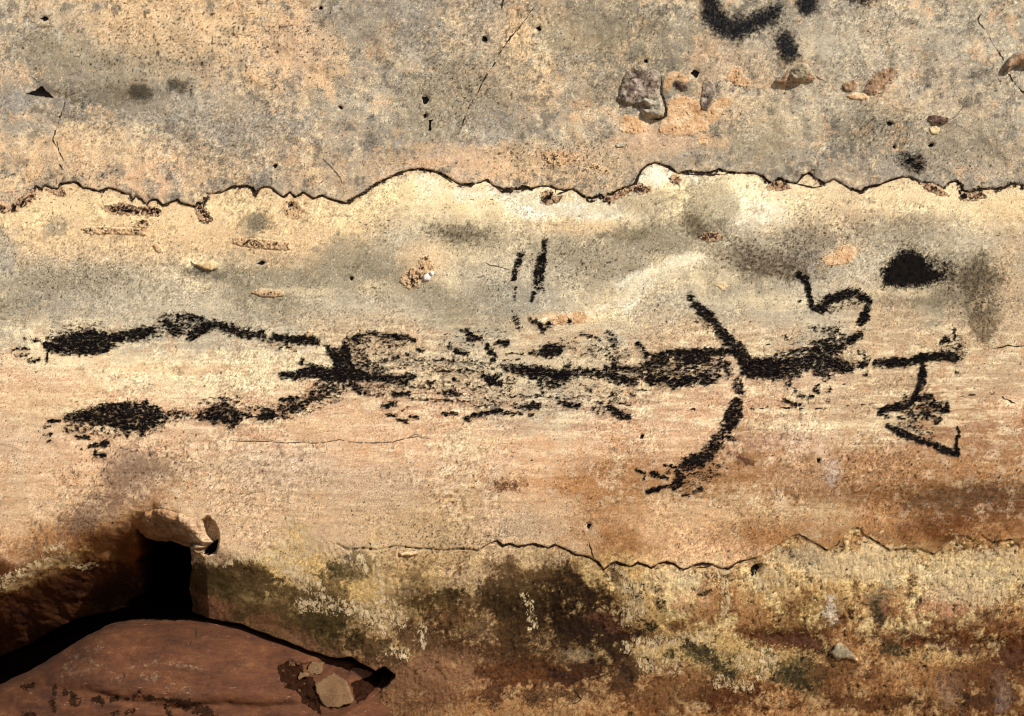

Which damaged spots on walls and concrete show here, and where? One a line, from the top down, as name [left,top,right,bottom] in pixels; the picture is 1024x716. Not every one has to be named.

crack [1,93,1024,212]
crack [339,540,754,583]
crack [797,527,1012,561]
damp [821,595,843,624]